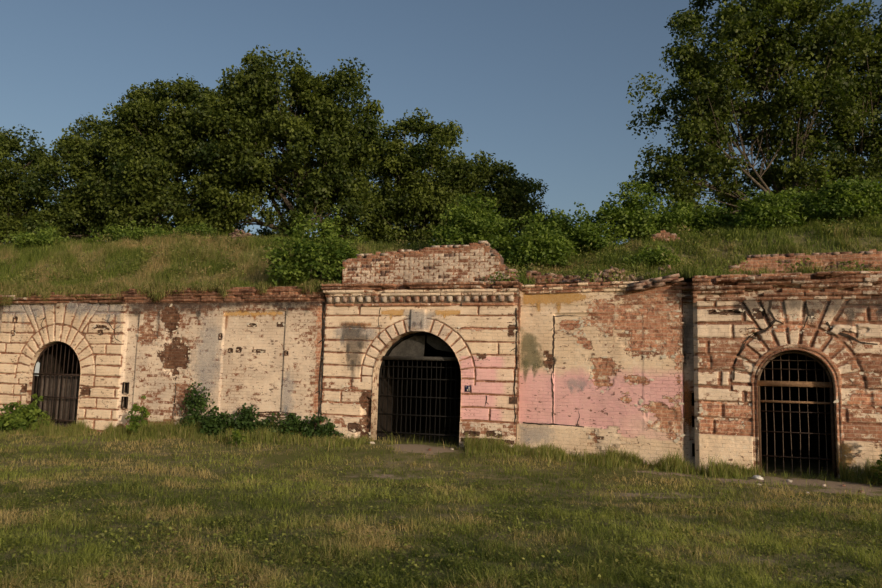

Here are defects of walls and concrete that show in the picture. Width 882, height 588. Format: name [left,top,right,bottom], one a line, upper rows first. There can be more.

peeling [136,304,196,422]
peeling [556,293,686,447]
peeling [696,400,756,435]
peeling [833,356,882,468]